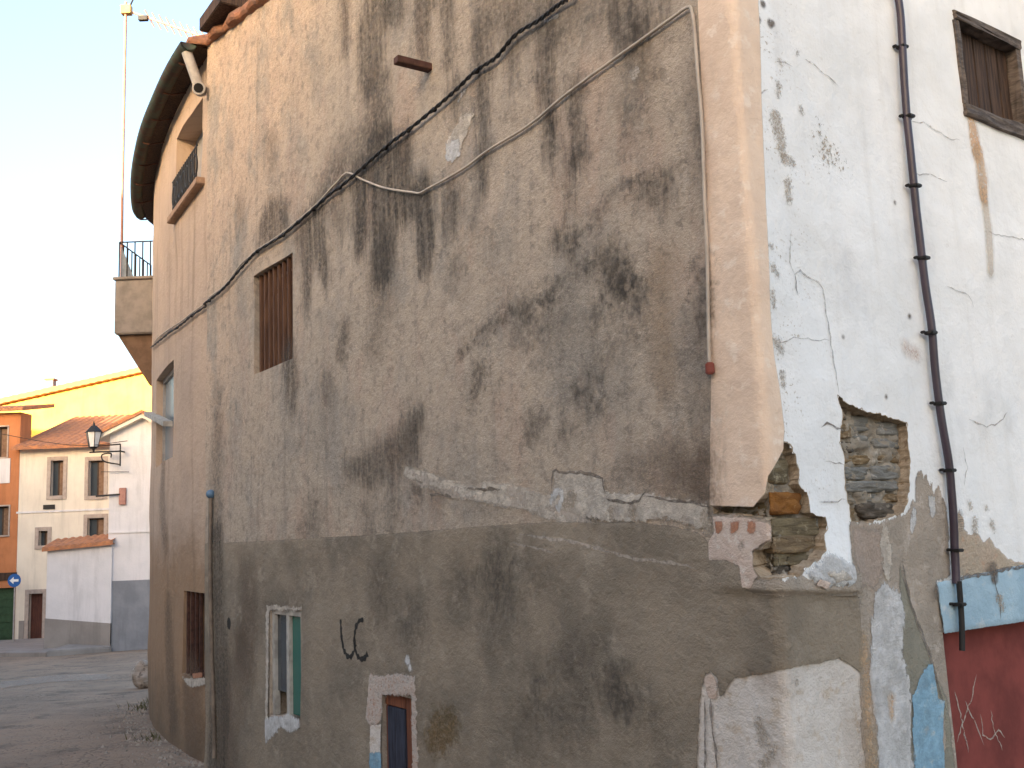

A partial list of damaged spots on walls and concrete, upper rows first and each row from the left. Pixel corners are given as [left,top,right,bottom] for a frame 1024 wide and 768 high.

damp [346,0,403,98]
spalling [445,89,474,164]
damp [300,204,327,306]
damp [352,120,456,289]
crack [776,230,839,390]
damp [354,420,580,522]
flaking render [548,394,1024,768]
spalling [365,655,419,768]